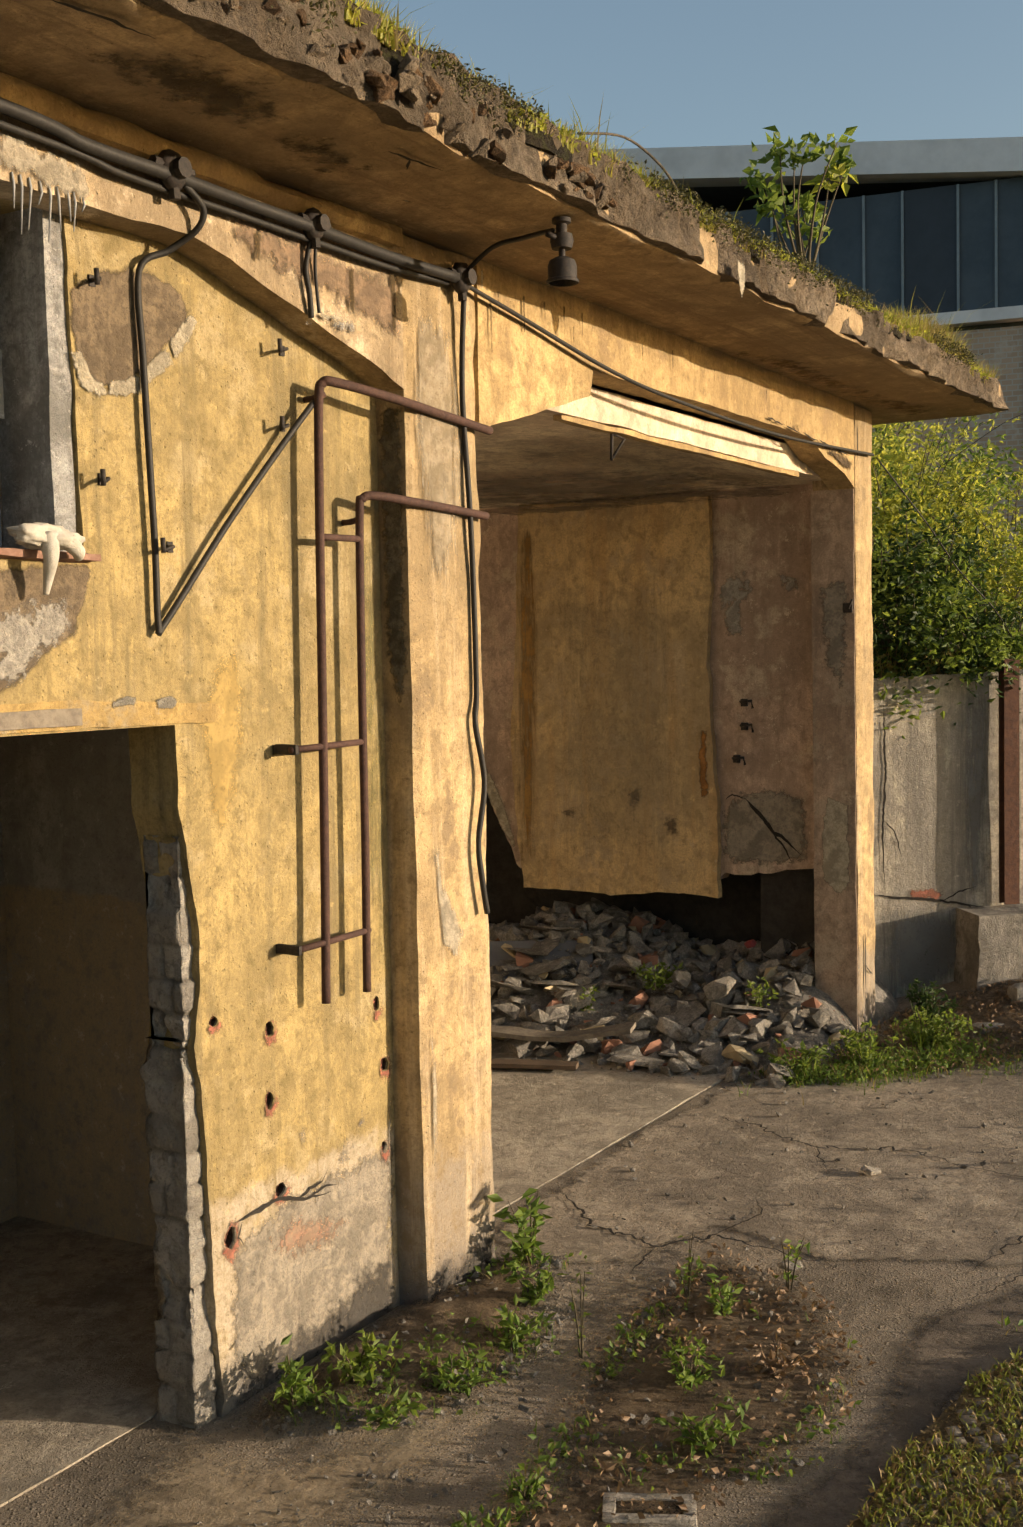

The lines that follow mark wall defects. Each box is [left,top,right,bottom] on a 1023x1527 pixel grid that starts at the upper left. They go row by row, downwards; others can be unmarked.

water stain [92,54,288,129]
water stain [0,133,89,242]
peeling [70,268,197,397]
peeling [0,563,91,691]
crack [726,794,801,863]
crack [717,1115,1023,1177]
crack [237,1170,337,1245]
crack [557,1188,860,1271]
crack [952,1236,1023,1305]